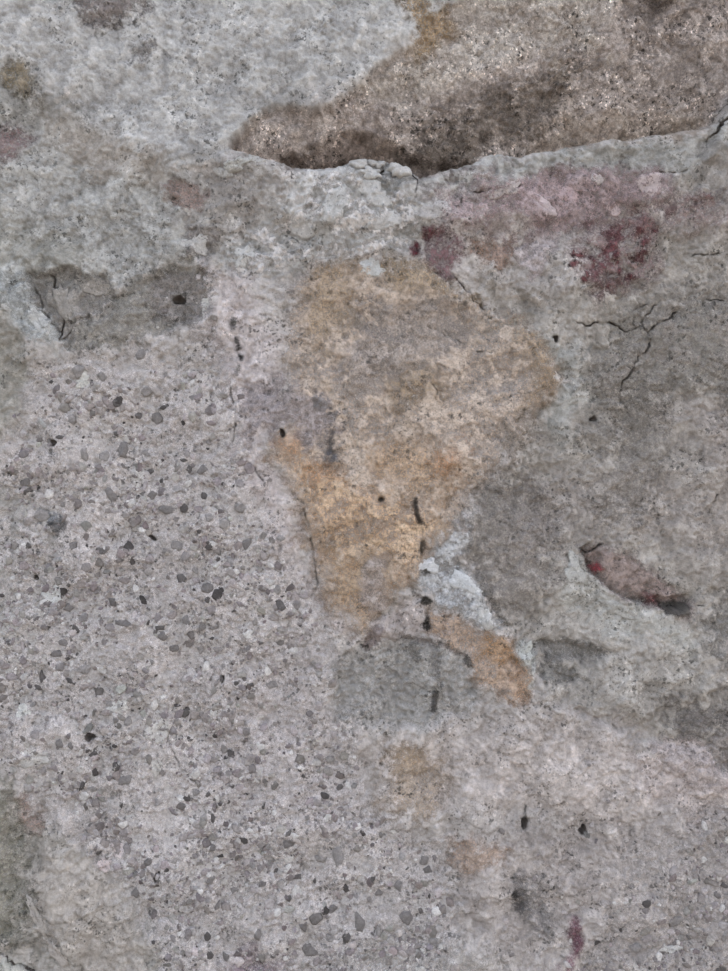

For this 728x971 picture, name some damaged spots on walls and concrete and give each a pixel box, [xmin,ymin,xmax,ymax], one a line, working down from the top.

flaking render [213,154,267,179]
crack [709,101,728,138]
crack [576,304,676,418]
rust [242,258,559,635]
rust [427,610,532,706]